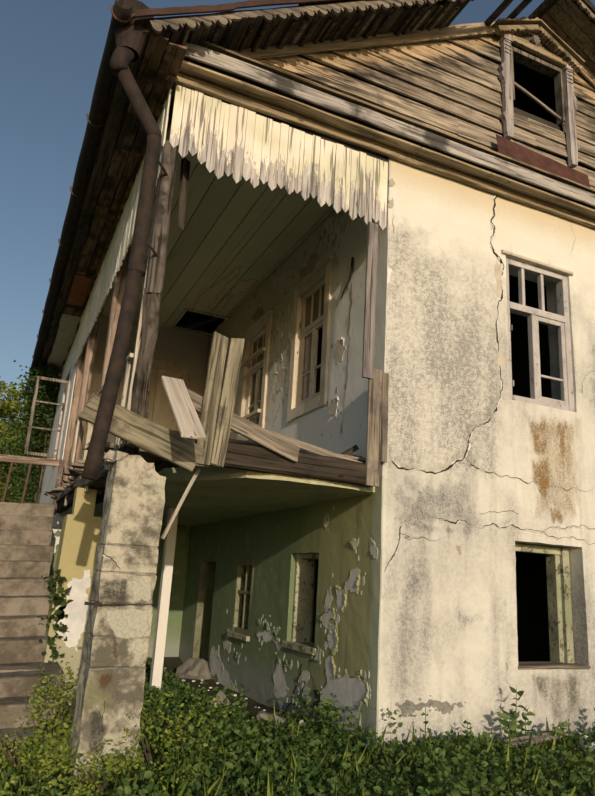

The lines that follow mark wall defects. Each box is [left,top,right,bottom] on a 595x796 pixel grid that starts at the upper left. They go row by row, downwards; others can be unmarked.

crack [339,257,354,435]
crack [391,194,587,492]
crack [385,526,435,570]
crack [432,510,595,544]
peeling [54,569,92,652]
peeling [209,627,246,692]
peeling [256,538,371,741]
spalling [395,695,466,717]